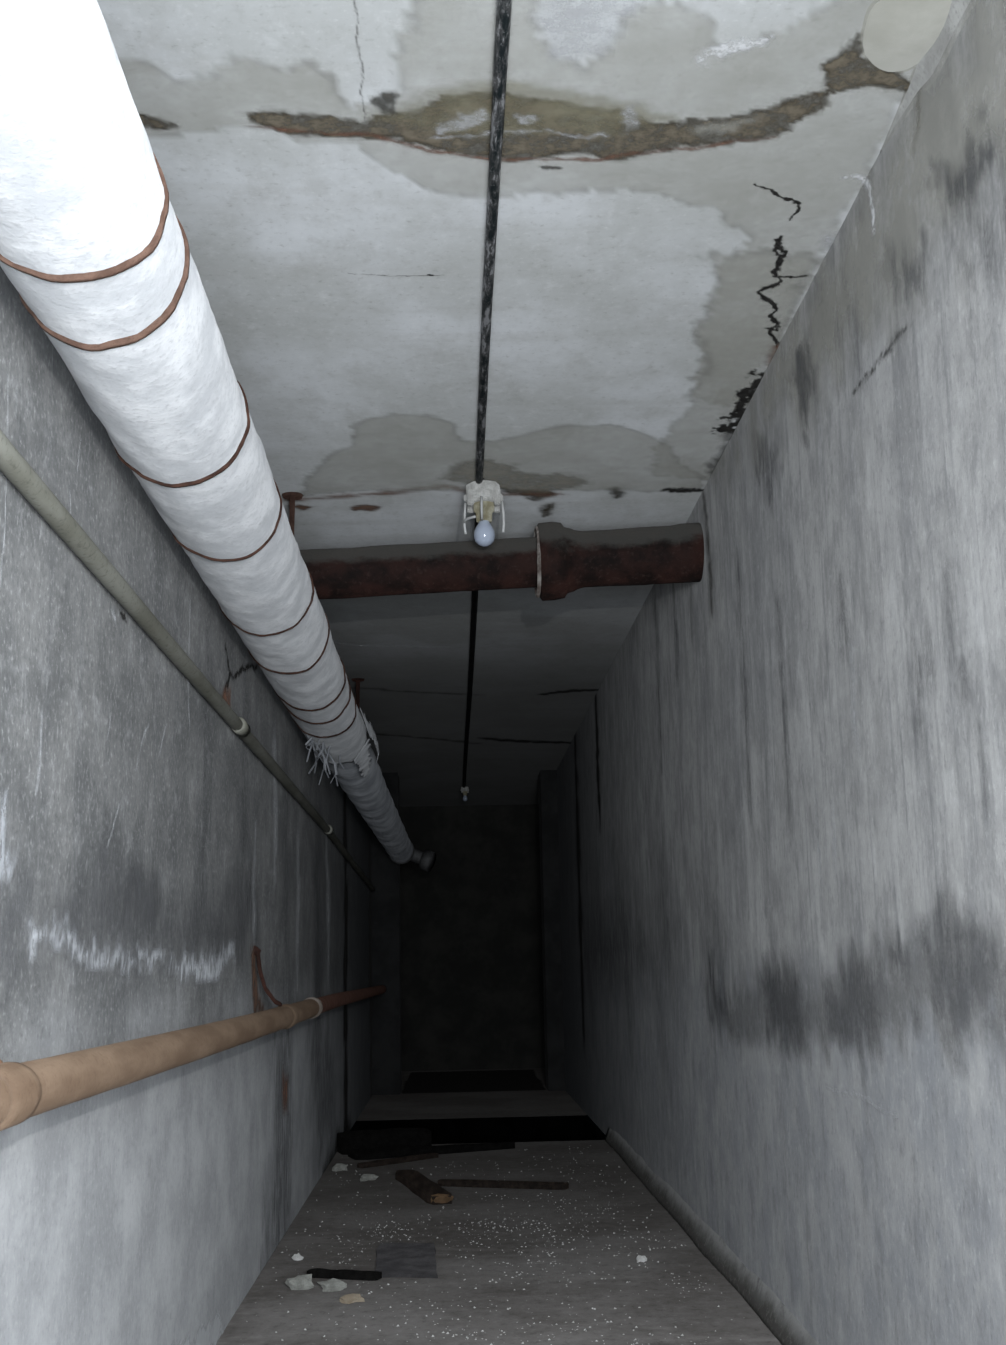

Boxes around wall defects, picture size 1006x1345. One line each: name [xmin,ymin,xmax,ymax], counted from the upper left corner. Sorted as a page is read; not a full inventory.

water stain [139,114,174,129]
water stain [248,0,1006,405]
crack [754,184,807,347]
water stain [431,459,586,517]
water stain [663,488,704,498]
water stain [0,798,11,878]
water stain [29,914,235,980]